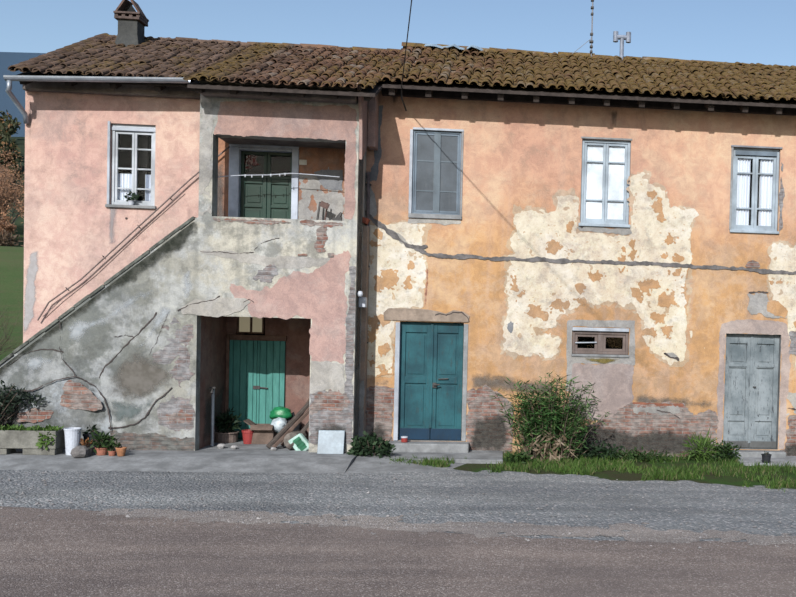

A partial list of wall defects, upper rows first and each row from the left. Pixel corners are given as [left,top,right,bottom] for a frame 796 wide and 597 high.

flaking render [17,408,54,423]
flaking render [60,380,103,411]
crack [10,296,219,430]
flaking render [253,264,278,283]
flaking render [199,94,345,258]
flaking render [309,220,432,445]
crack [365,210,796,275]
flaking render [499,169,699,367]
flaking render [746,162,796,370]
flaking render [782,392,796,456]